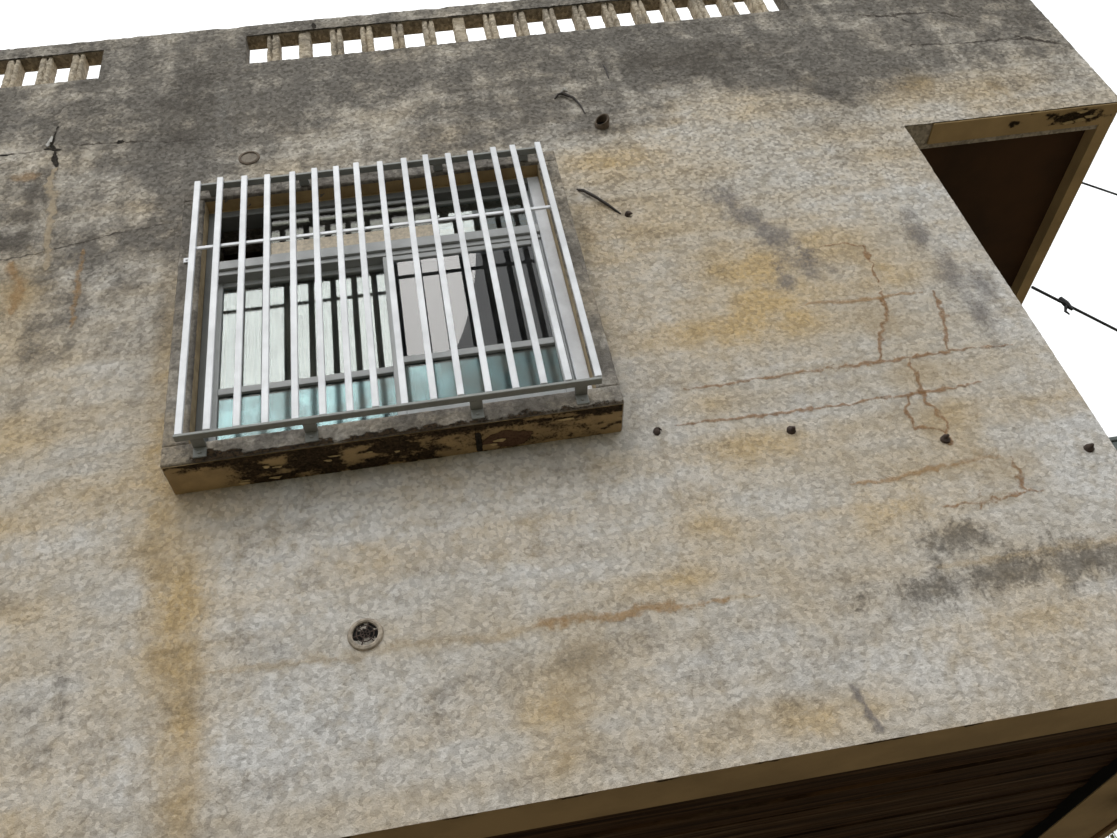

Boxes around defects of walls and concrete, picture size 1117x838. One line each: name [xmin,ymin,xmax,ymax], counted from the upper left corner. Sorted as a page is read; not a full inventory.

peeling [1009,108,1111,128]
crack [677,243,1013,445]
spalling [475,430,538,452]
crack [947,465,1030,507]